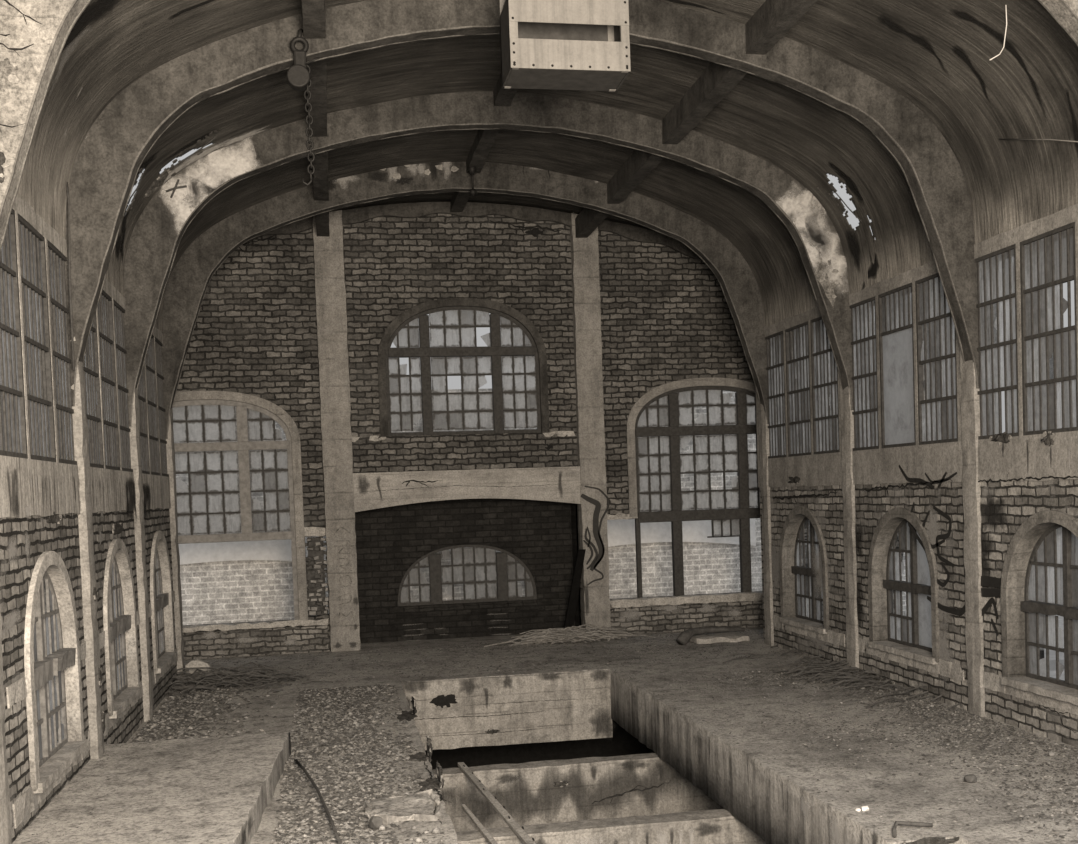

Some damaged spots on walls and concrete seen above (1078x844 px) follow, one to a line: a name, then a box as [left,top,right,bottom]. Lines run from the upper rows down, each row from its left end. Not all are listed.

leakage [54,0,117,84]
spalling [130,140,203,207]
leakage [829,164,862,201]
leakage [777,191,879,290]
hole [429,694,458,711]
spalling [408,735,445,791]
leakage [460,762,677,822]
leakage [646,825,715,844]
spalling [901,836,959,844]